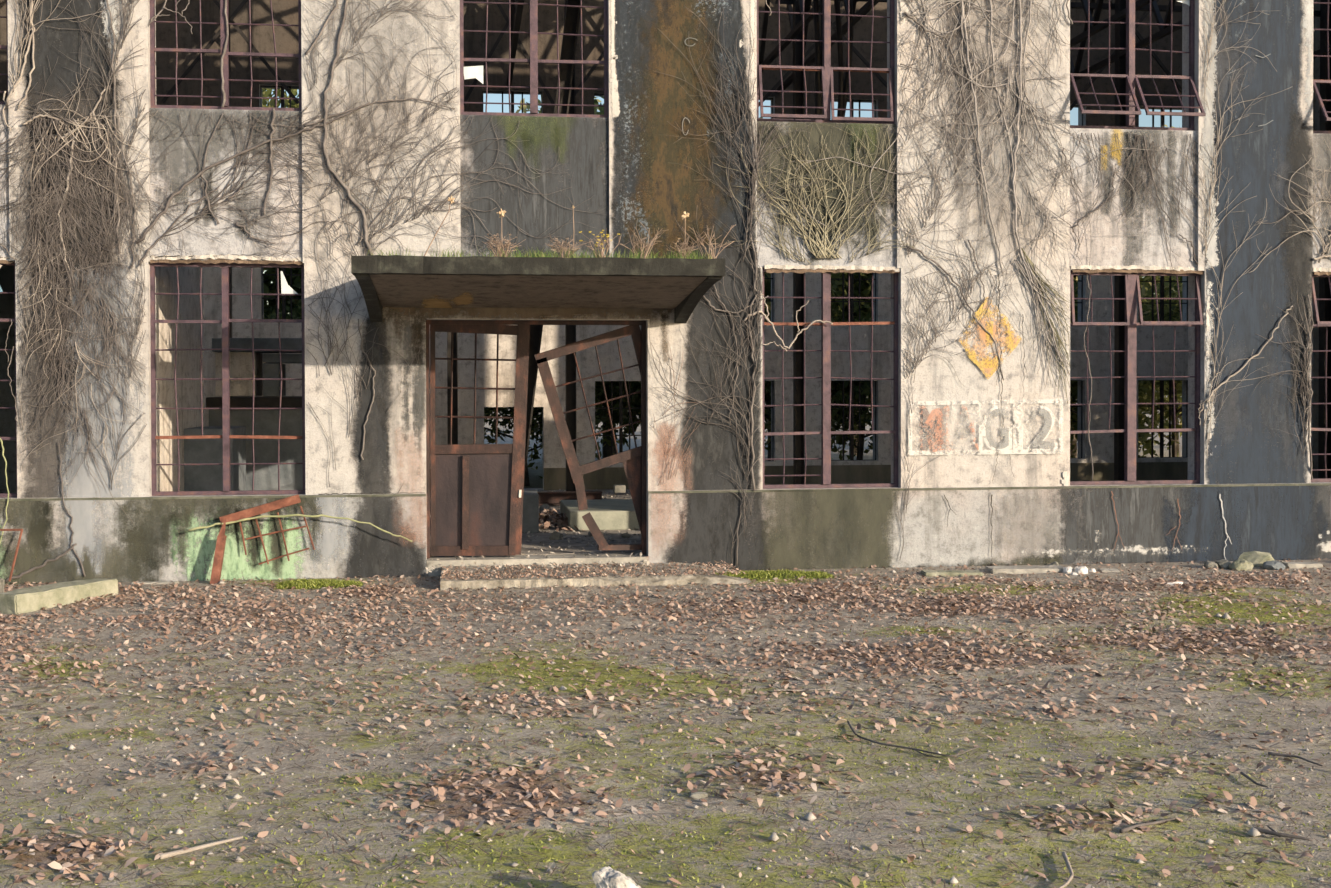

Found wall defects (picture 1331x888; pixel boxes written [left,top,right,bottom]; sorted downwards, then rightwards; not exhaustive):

water stain [1021,0,1331,564]
water stain [163,509,292,581]
water stain [310,317,427,578]